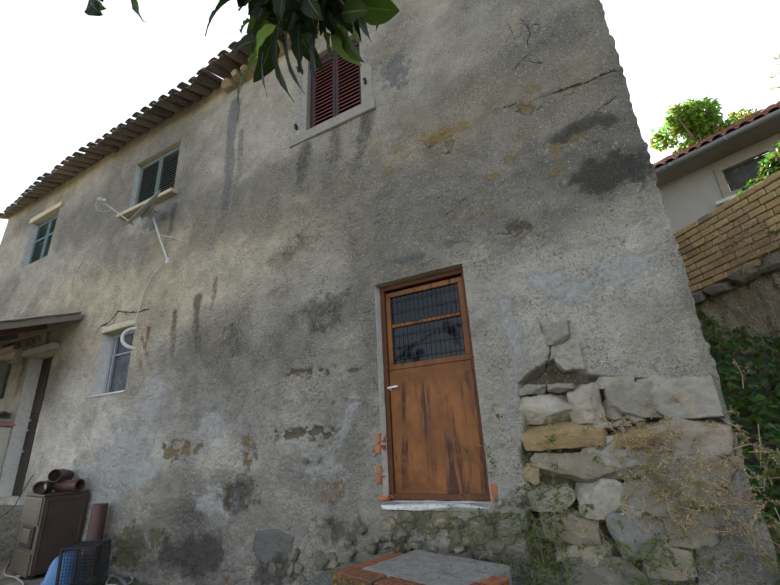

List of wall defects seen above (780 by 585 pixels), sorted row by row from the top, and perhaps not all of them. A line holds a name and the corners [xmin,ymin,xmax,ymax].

crack [506,20,542,69]
crack [542,69,619,98]
spalling [541,320,586,373]
spalling [162,438,203,468]
spalling [518,375,738,585]
water stain [254,556,296,585]